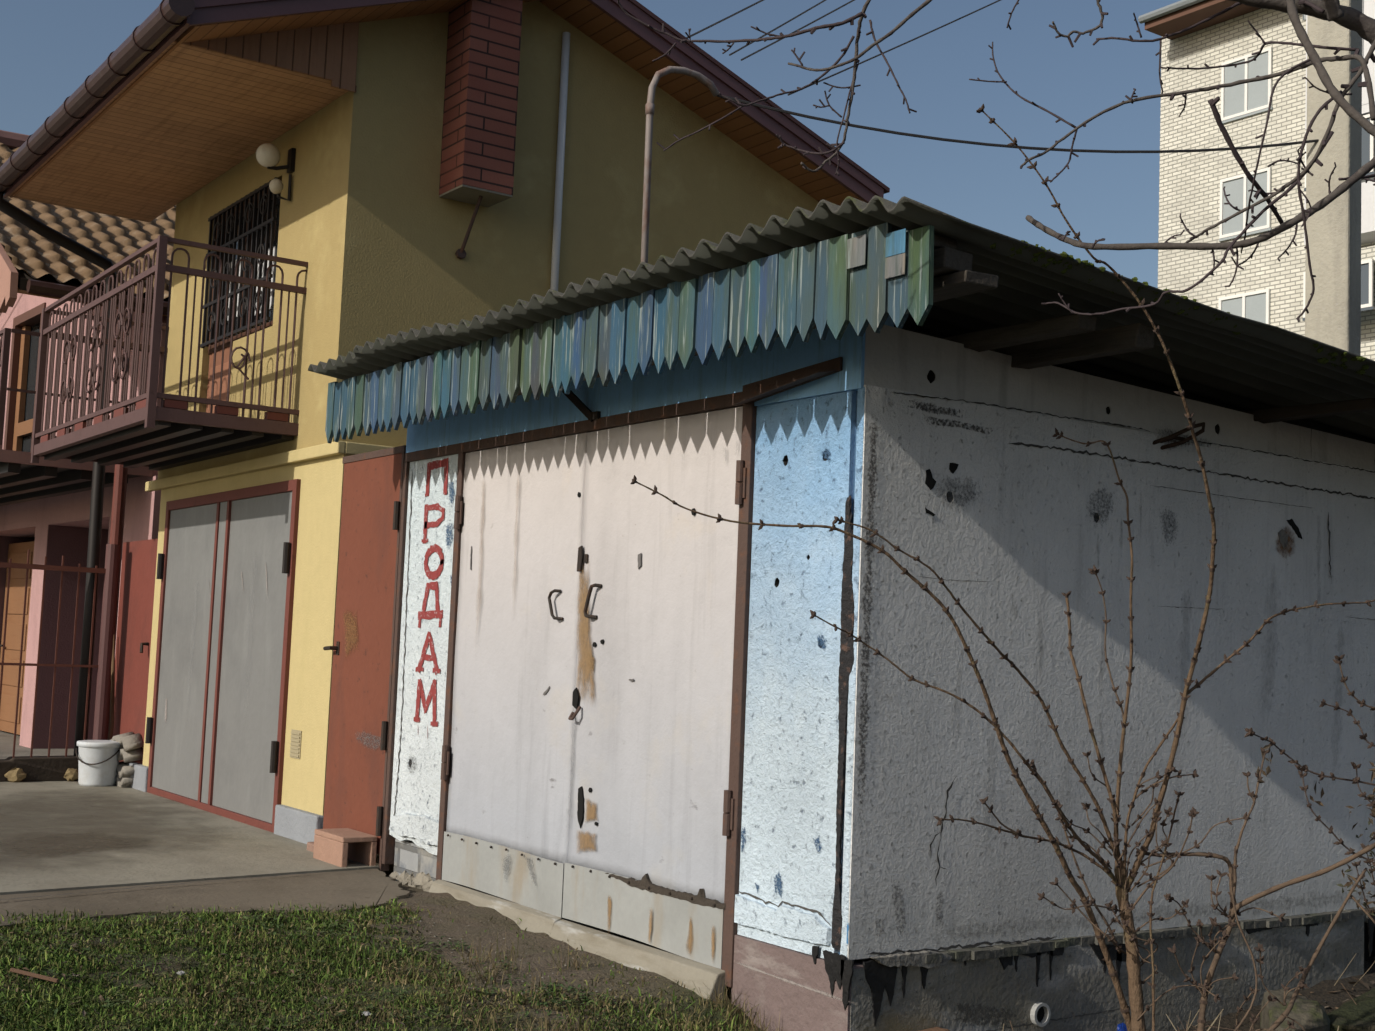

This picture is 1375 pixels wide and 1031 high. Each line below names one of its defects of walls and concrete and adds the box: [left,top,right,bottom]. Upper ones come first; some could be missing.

rust [577,573,594,698]
rust [578,800,596,851]